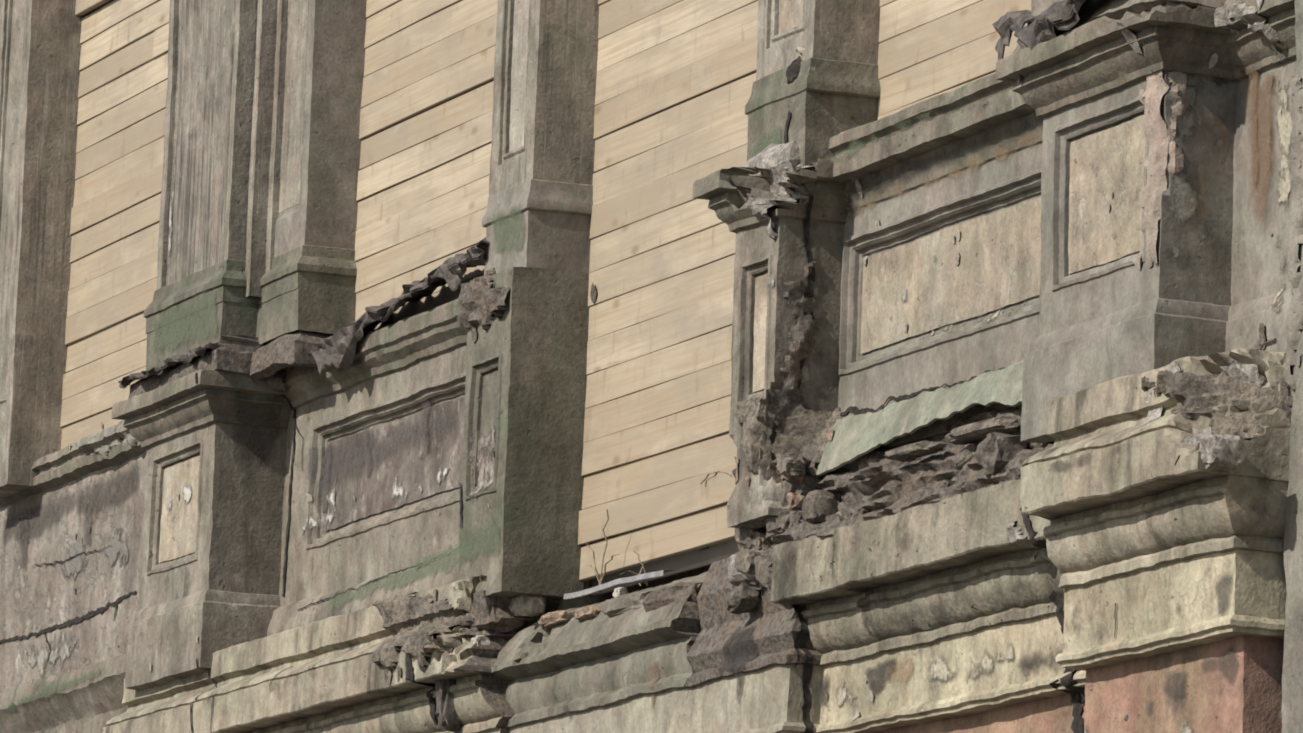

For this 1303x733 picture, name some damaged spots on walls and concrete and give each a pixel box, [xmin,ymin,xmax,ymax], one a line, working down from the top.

spalling [1116,22,1142,54]
spalling [1214,0,1287,61]
spalling [1132,53,1218,270]
spalling [724,163,812,240]
spalling [1140,75,1303,465]
spalling [726,260,1054,615]
crack [282,394,462,610]
crack [1019,506,1047,548]
crack [0,591,136,669]
spalling [371,588,483,687]
crack [1049,589,1064,634]
crack [1049,668,1085,733]